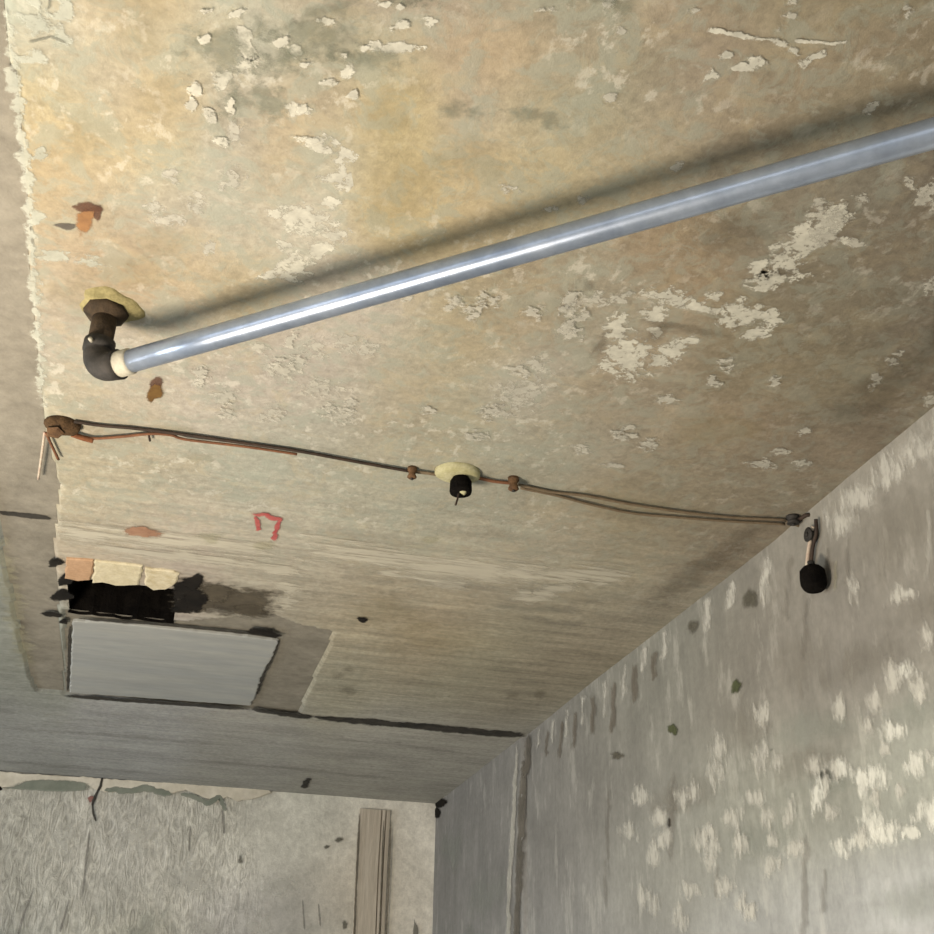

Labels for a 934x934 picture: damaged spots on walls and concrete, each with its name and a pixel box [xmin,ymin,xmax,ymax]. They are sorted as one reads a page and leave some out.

peeling [376,0,410,31]
peeling [360,40,427,54]
peeling [709,27,846,72]
peeling [318,53,355,86]
corrosion [55,203,103,232]
peeling [256,133,359,284]
peeling [554,193,868,383]
peeling [443,291,500,323]
spalling [0,0,332,713]
peeling [706,359,734,388]
corrosion [147,377,163,403]
damp [743,591,756,606]